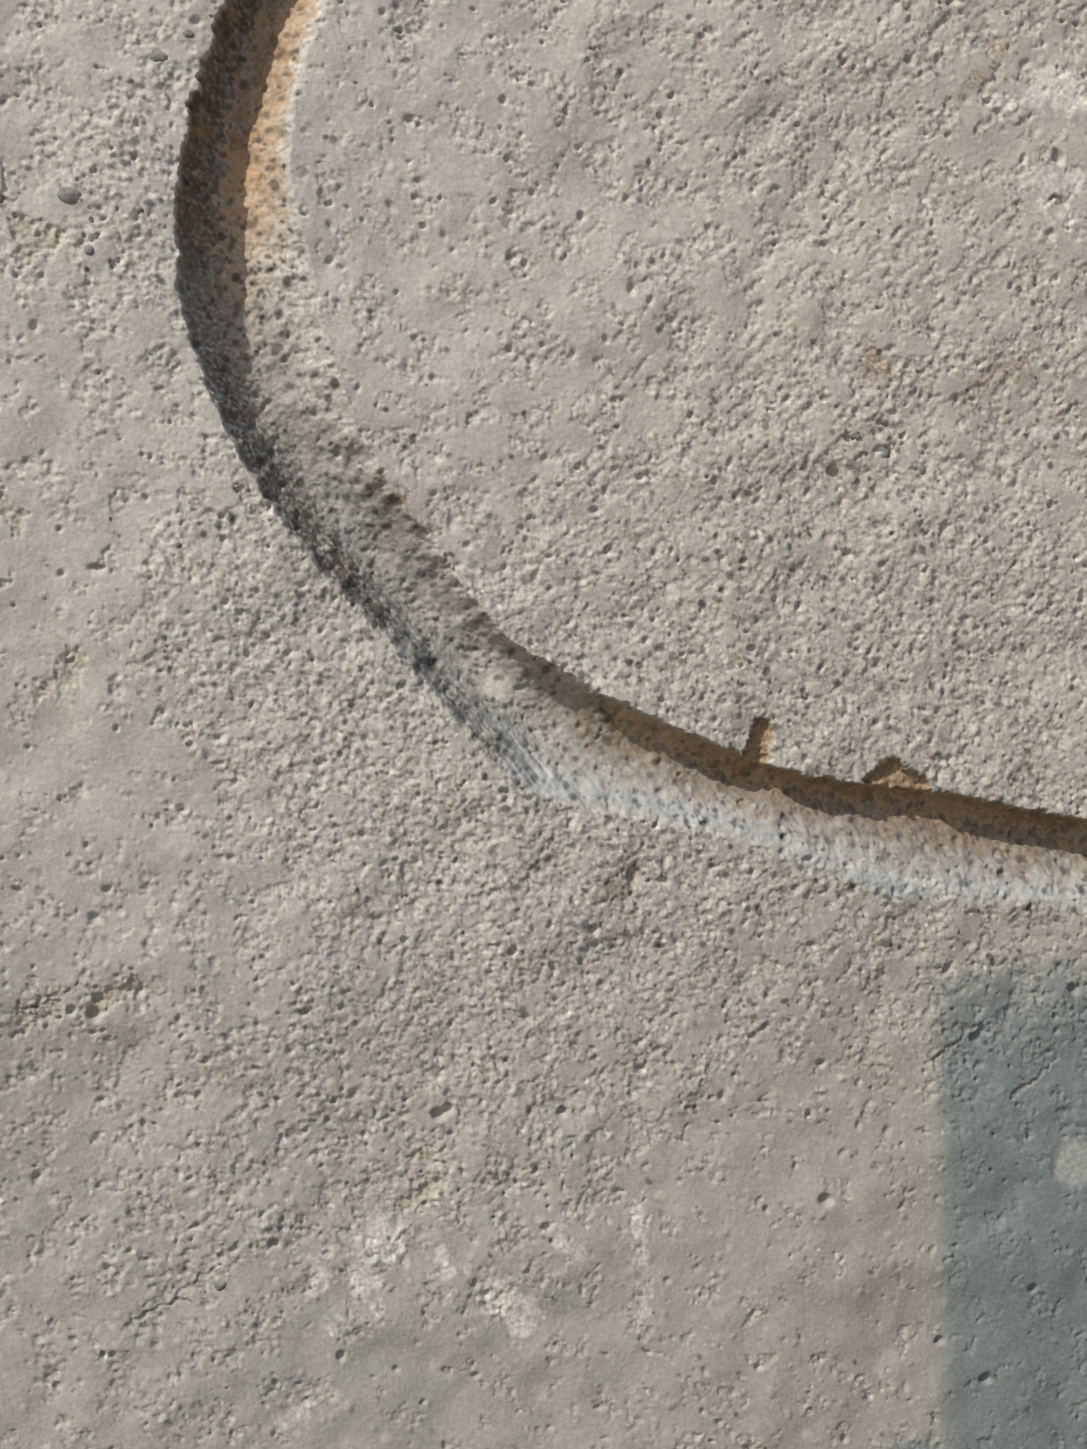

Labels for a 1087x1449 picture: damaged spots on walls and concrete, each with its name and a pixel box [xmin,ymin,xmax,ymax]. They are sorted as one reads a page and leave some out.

corrosion [212,0,324,359]
spalling [725,716,776,790]
corrosion [465,620,1087,884]
spalling [853,756,935,802]
corrosion [573,841,664,921]